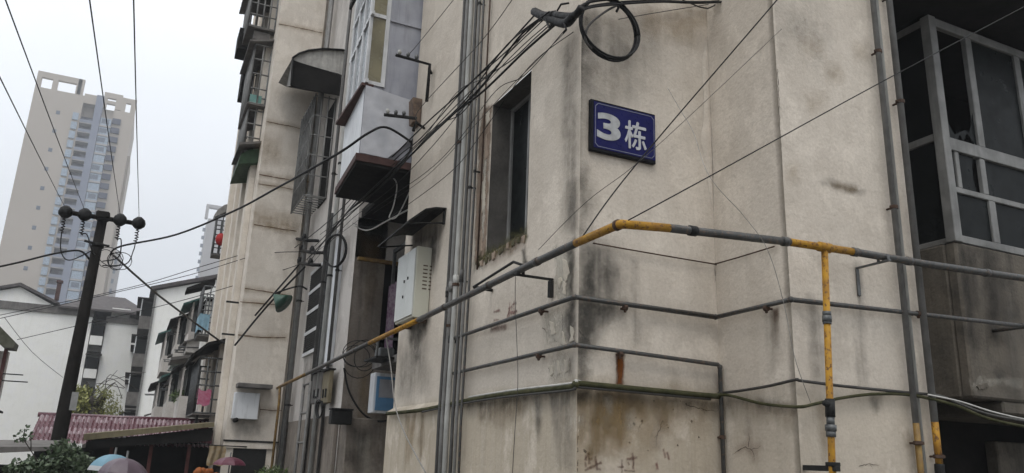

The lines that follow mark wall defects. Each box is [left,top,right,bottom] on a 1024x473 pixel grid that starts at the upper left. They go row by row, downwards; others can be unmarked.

peeling [555,253,573,299]
leakage [567,249,612,344]